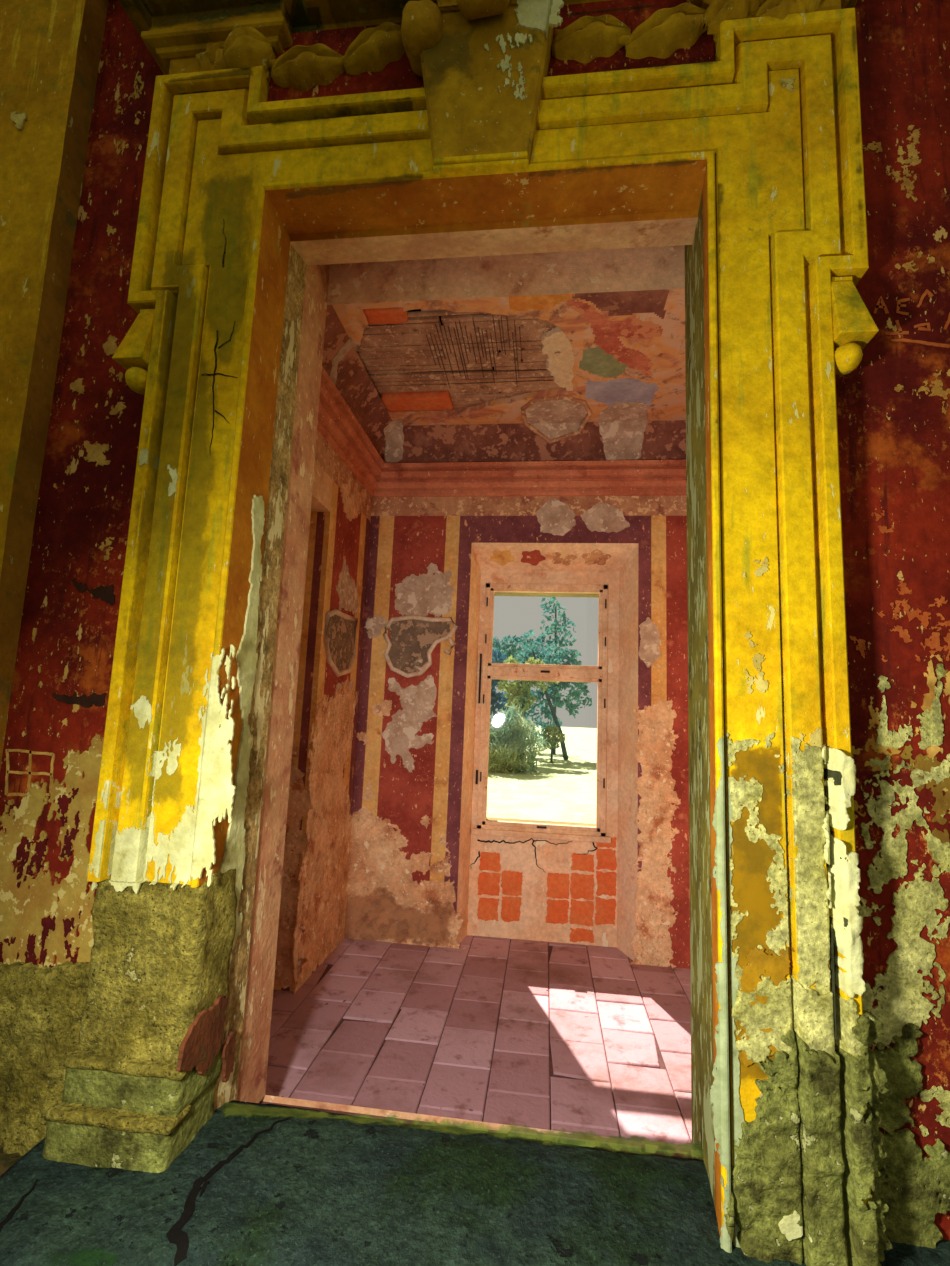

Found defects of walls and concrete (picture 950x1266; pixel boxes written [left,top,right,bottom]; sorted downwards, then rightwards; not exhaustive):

peeling [891,125,922,202]
crack [220,219,228,267]
crack [201,322,237,454]
flaking render [541,327,575,391]
peeling [894,369,950,414]
peeling [83,440,111,467]
peeling [0,495,265,1176]
flaking render [477,852,523,922]
crack [470,838,598,872]
flaking render [545,837,617,943]
flaking render [630,698,681,969]
flaking render [710,581,950,1266]